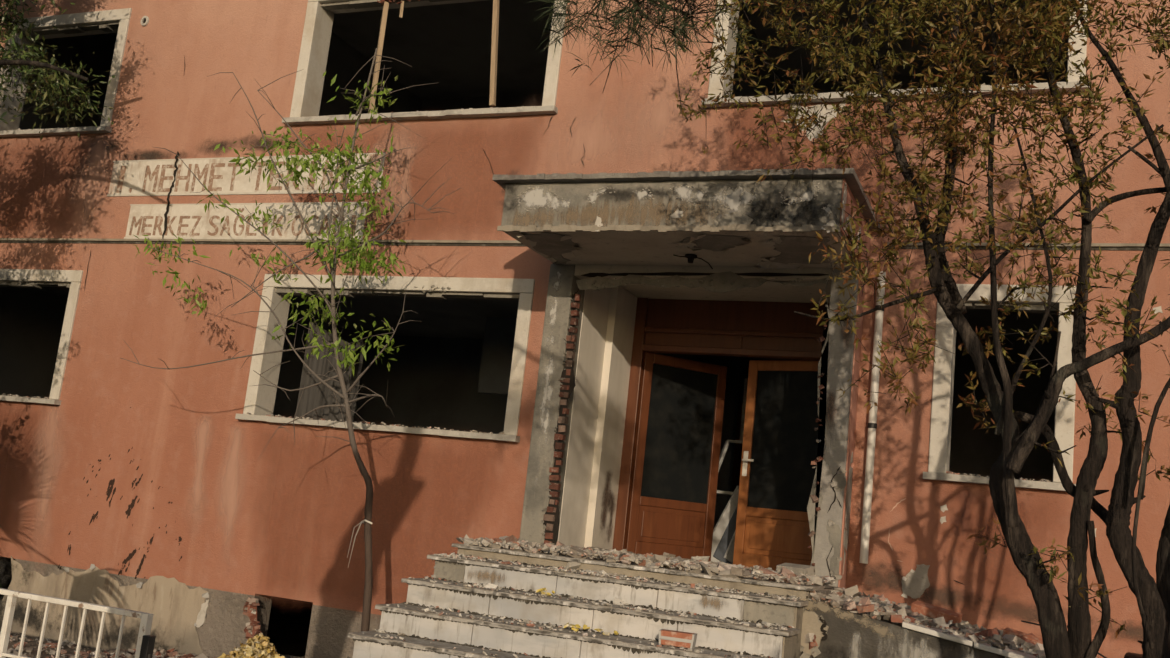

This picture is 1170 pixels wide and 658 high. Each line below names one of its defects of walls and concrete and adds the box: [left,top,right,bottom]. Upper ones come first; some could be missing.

peeling [679,183,863,270]
spalling [541,289,581,544]
leakage [83,447,163,526]
crack [827,466,841,513]
leakage [118,522,182,579]
peeling [0,556,209,658]